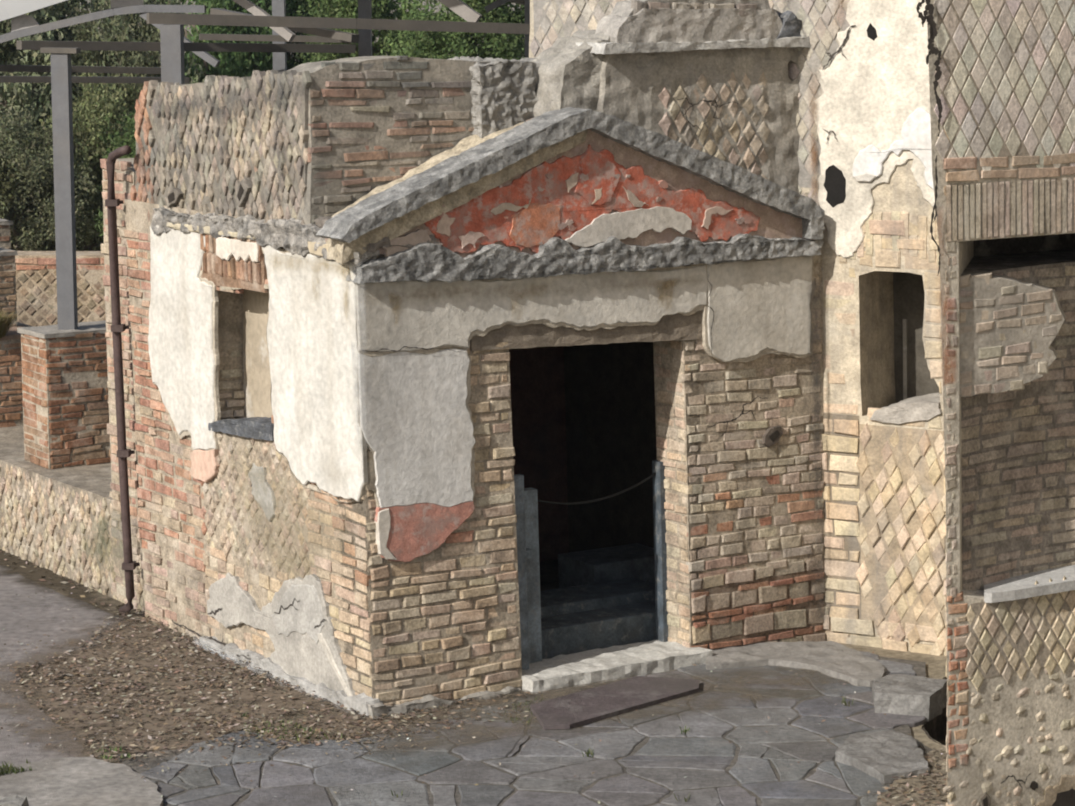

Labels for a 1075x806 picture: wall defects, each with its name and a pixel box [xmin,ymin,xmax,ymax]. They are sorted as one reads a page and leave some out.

spalling [166,188,184,208]
flaking render [381,205,485,257]
flaking render [490,149,751,248]
flaking render [814,0,935,258]
crack [916,0,943,276]
flaking render [148,222,815,562]
flaking render [207,572,356,696]
spalling [1030,774,1075,806]